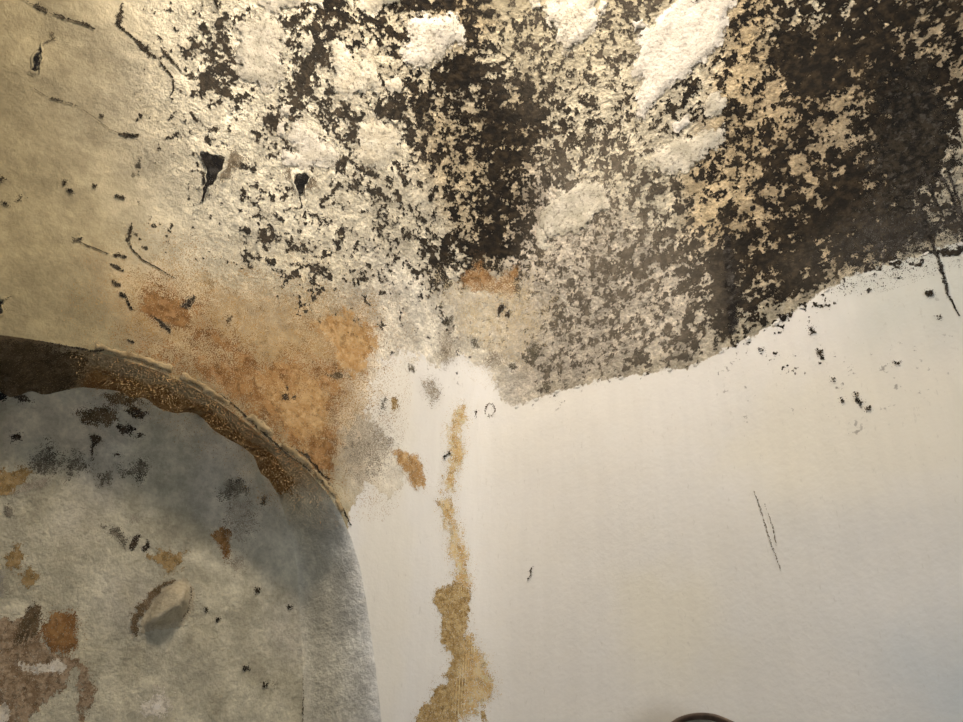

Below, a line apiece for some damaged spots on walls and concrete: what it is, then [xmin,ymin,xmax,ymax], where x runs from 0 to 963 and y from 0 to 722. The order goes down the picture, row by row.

crack [27,1,182,96]
leakage [0,0,963,529]
flaking render [0,393,35,406]
spalling [38,340,430,525]
peeling [408,315,544,409]
spalling [0,463,63,499]
leakage [0,542,45,598]